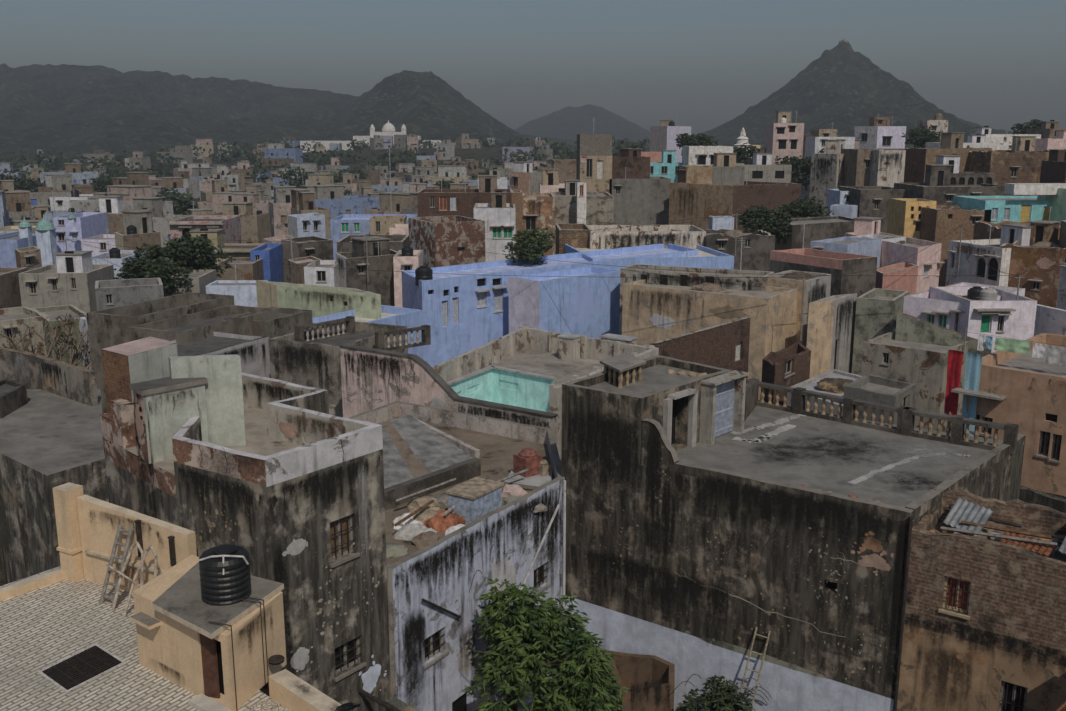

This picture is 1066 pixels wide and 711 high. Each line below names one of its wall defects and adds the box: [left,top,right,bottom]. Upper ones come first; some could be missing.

leakage [458,406,550,428]
leakage [178,455,380,548]
peeling [282,538,308,556]
peeling [316,536,379,637]
leakage [395,416,1066,696]
peeling [807,525,894,604]
peeling [290,646,313,672]
peeling [359,655,387,694]